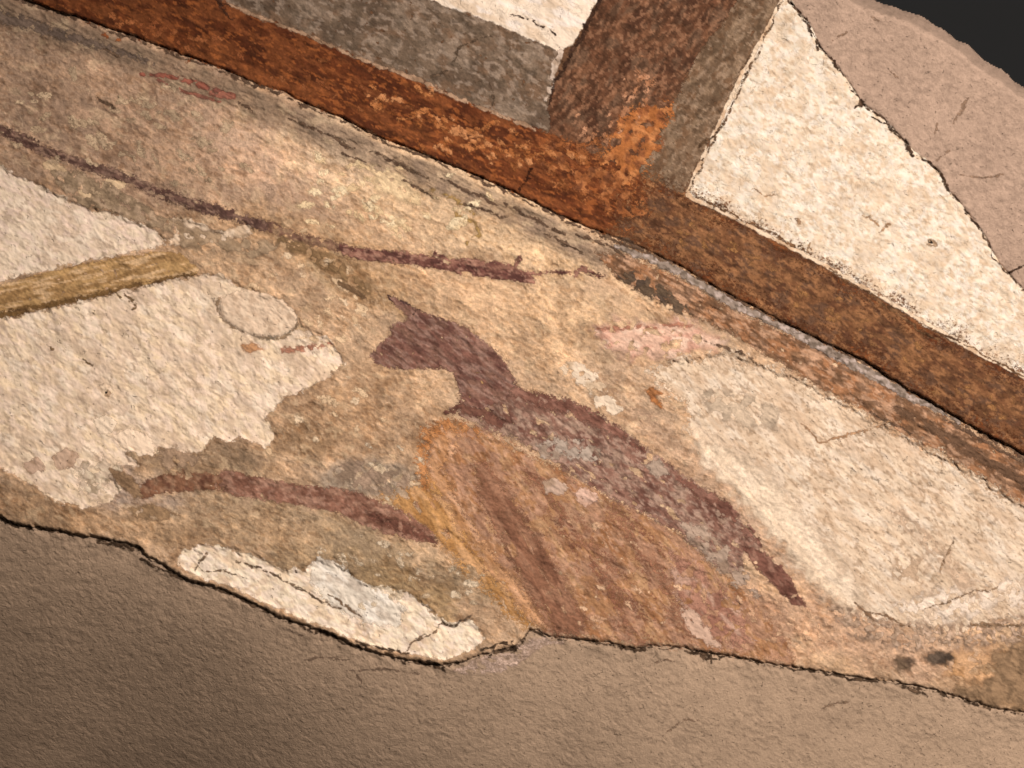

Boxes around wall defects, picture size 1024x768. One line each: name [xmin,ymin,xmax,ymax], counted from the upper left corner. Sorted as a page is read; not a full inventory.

peeling [15,92,52,135]
peeling [43,155,67,176]
peeling [67,115,159,167]
peeling [0,165,253,282]
peeling [0,266,368,510]
peeling [368,445,421,505]
peeling [536,437,601,464]
peeling [644,347,1024,636]
peeling [177,540,485,660]
crack [0,517,1024,715]
peeling [578,606,607,629]
peeling [679,519,858,660]